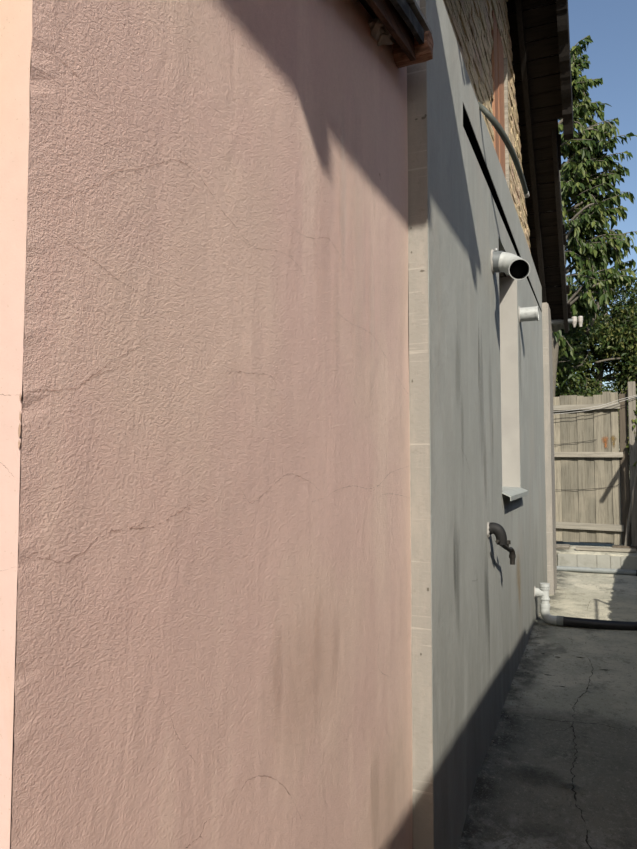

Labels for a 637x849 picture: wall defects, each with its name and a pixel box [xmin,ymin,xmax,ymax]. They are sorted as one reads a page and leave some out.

crack [507,658,637,849]